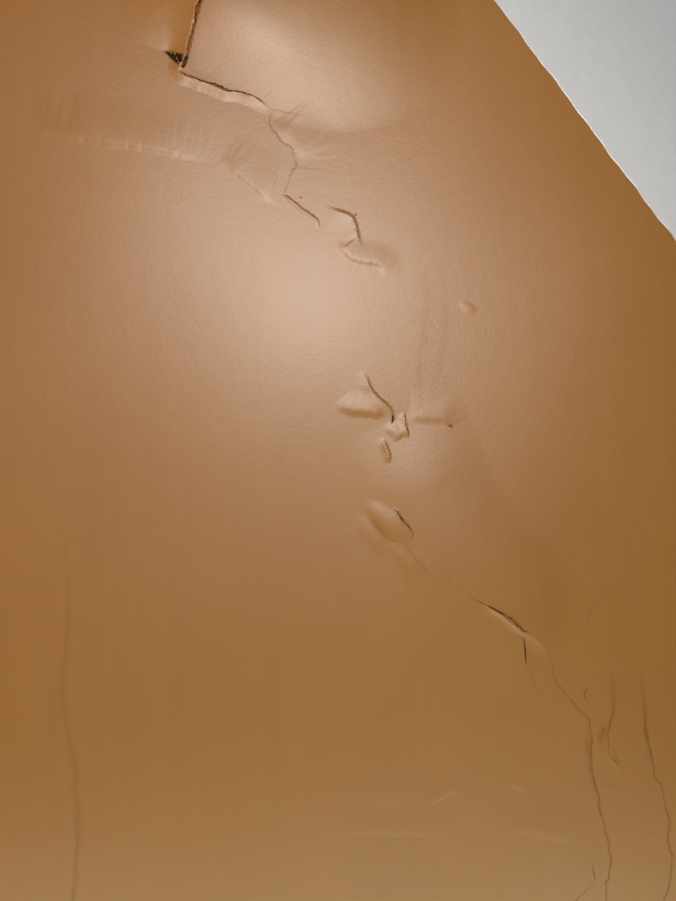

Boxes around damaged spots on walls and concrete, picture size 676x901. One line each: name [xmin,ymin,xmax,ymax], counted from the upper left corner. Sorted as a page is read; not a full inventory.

crack [113,0,342,162]
crack [326,206,361,239]
crack [479,603,567,660]